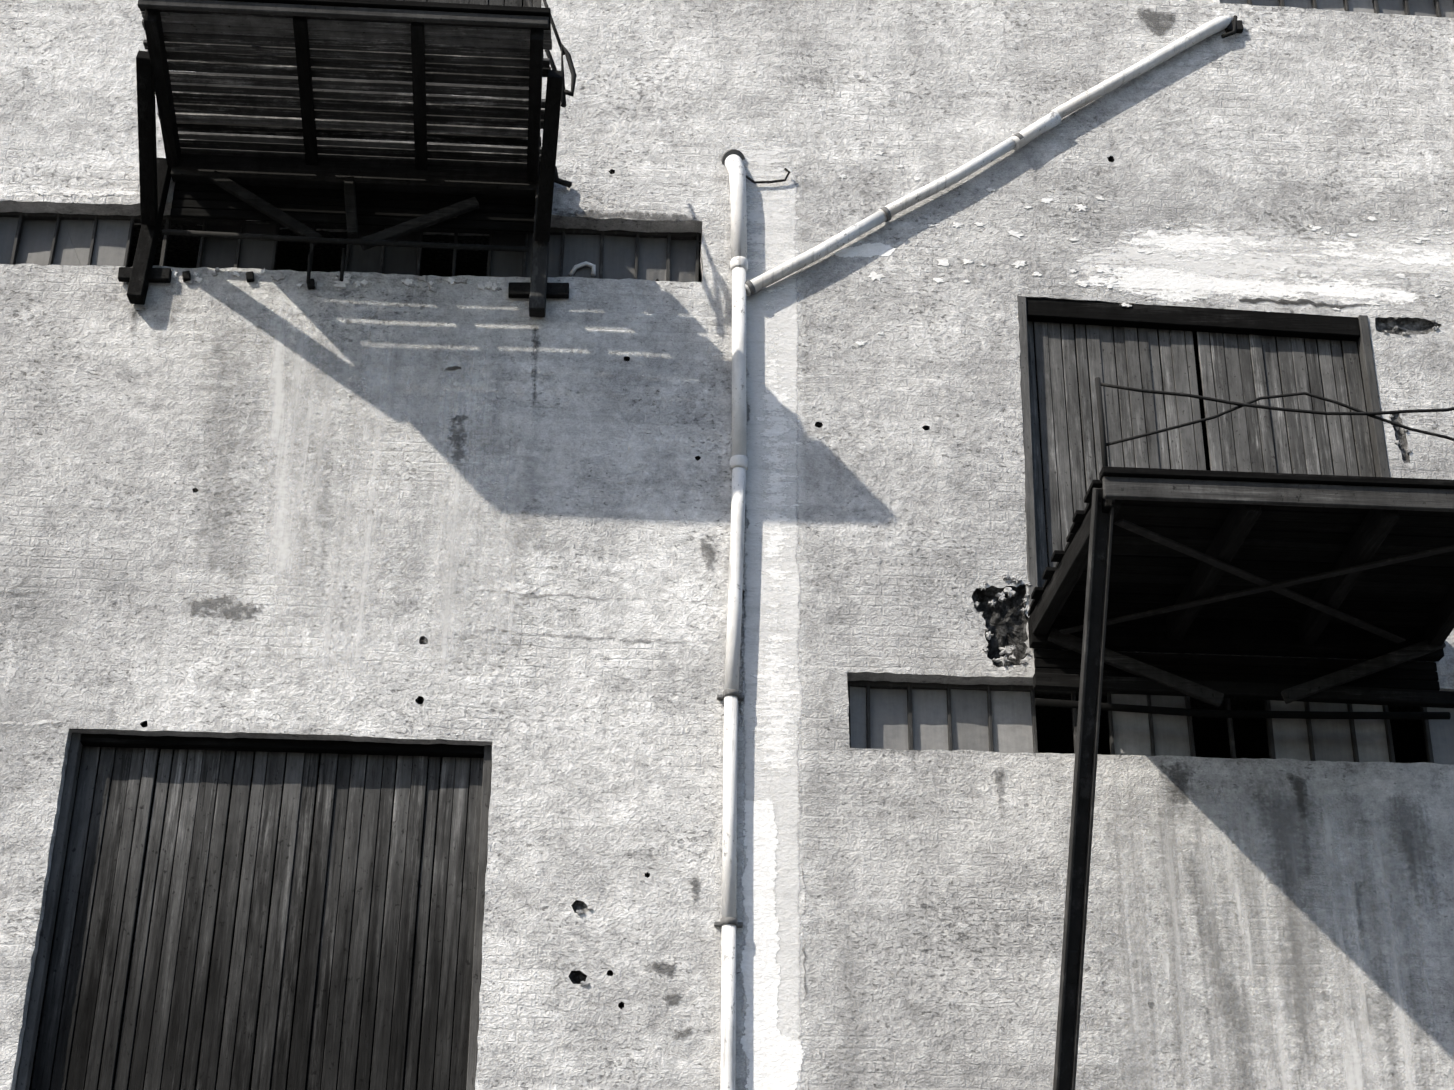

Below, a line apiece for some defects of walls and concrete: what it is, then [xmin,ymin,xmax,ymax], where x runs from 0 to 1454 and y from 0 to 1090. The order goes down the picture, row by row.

peeling [833,242,896,281]
peeling [933,259,986,283]
peeling [1011,207,1454,335]
peeling [729,130,803,1042]
spalling [972,573,1031,668]
water stain [1161,764,1188,802]
water stain [1194,845,1252,1031]
water stain [1238,775,1311,1090]
water stain [1333,915,1370,1090]